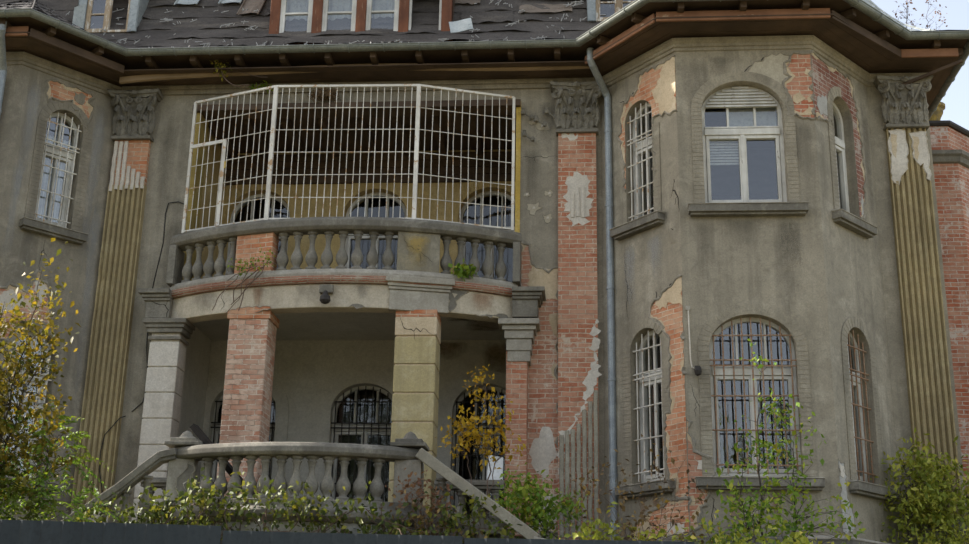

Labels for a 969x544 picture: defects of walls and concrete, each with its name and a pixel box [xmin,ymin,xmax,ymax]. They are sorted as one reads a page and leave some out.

flaking render [44,78,95,130]
flaking render [617,54,678,192]
flaking render [747,50,867,219]
flaking render [887,129,932,185]
flaking render [0,269,56,342]
flaking render [628,274,717,541]